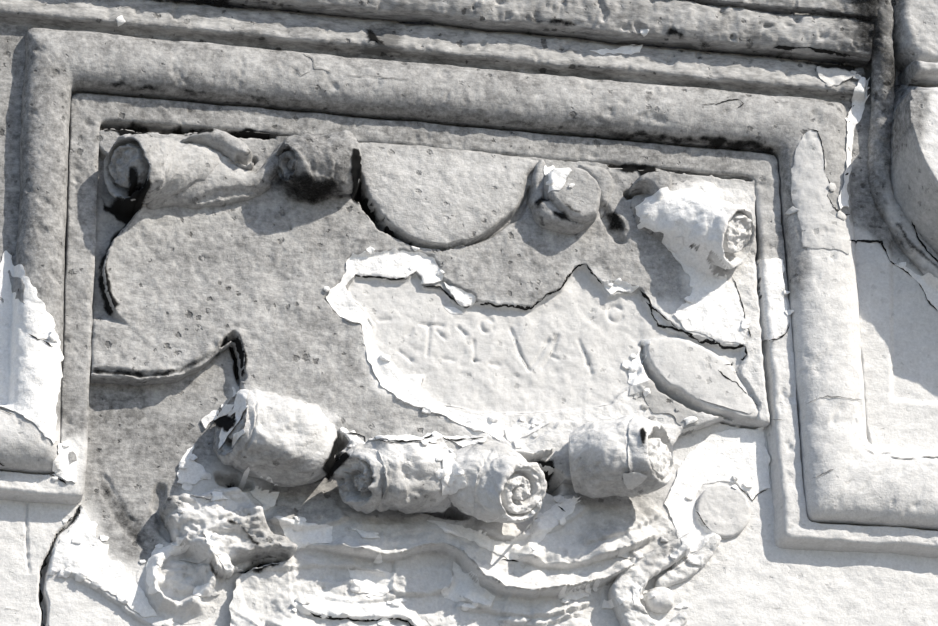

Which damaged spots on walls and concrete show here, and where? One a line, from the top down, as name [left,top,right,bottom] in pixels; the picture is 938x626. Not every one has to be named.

flaking render [784,66,870,254]
flaking render [0,251,79,483]
crack [477,263,602,310]
spalling [324,187,794,496]
flaking render [895,262,938,311]
crack [39,505,81,626]
flaking render [427,495,581,562]
flaking render [664,423,770,569]